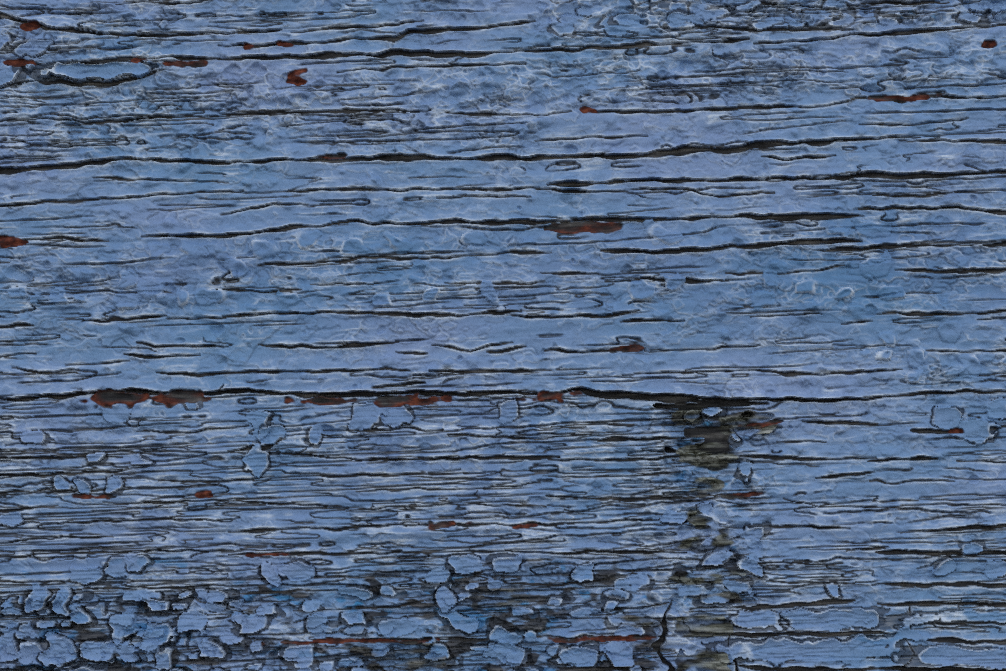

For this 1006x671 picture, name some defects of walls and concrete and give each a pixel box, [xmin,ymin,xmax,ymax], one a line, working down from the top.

peeling [36,0,55,15]
peeling [0,29,152,89]
peeling [403,28,428,52]
crack [0,0,1006,87]
peeling [517,0,810,60]
crack [0,95,1006,420]
peeling [90,404,134,424]
peeling [231,375,291,482]
peeling [349,394,420,447]
peeling [53,476,92,495]
crack [0,345,1006,671]
peeling [646,388,1006,671]